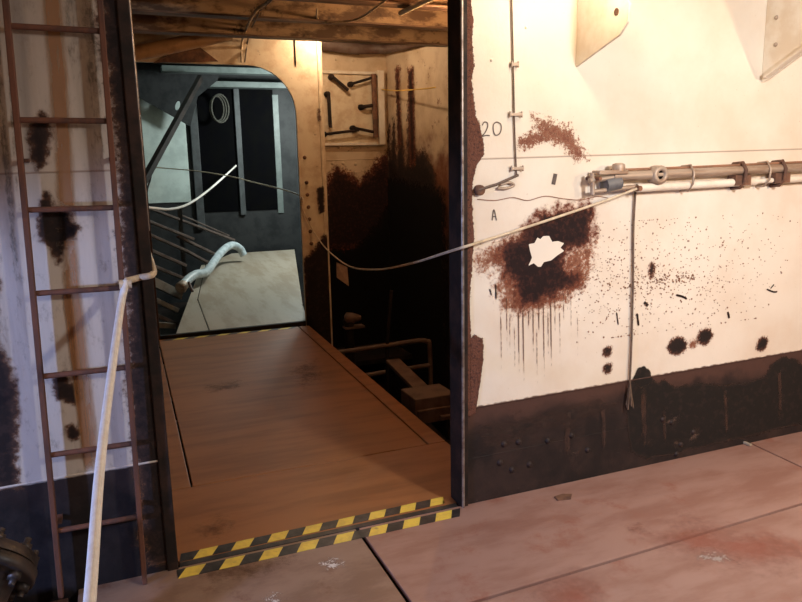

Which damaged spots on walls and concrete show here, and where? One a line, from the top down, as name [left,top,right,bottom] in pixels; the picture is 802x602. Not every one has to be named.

corrosion [0,348,21,490]
corrosion [26,0,96,467]
corrosion [93,0,167,566]
corrosion [304,65,448,386]
corrosion [467,0,484,417]
peeling [529,236,564,267]
corrosion [518,112,590,165]
corrosion [576,213,780,375]